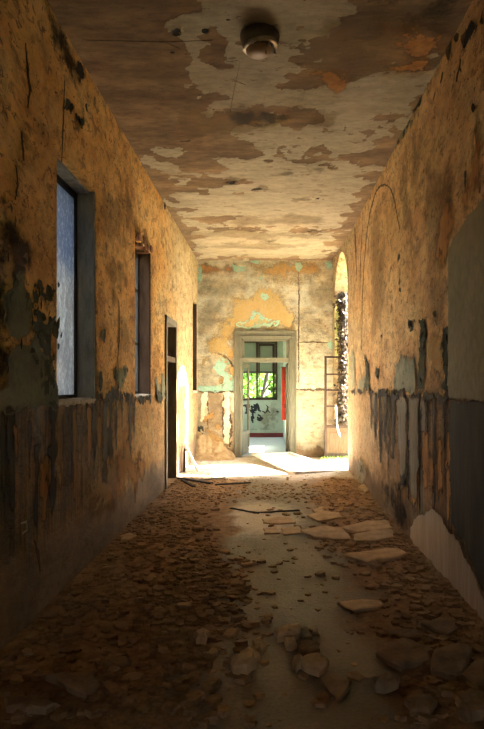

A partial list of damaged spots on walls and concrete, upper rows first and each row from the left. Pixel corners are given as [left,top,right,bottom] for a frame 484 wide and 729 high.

crack [14,131,24,200]
crack [24,43,32,108]
peeling [140,0,484,281]
spalling [135,225,153,254]
crack [354,184,400,302]
peeling [0,271,62,416]
damp [28,398,135,528]
spalling [94,366,166,407]
peeling [198,276,295,447]
peeling [349,310,449,530]